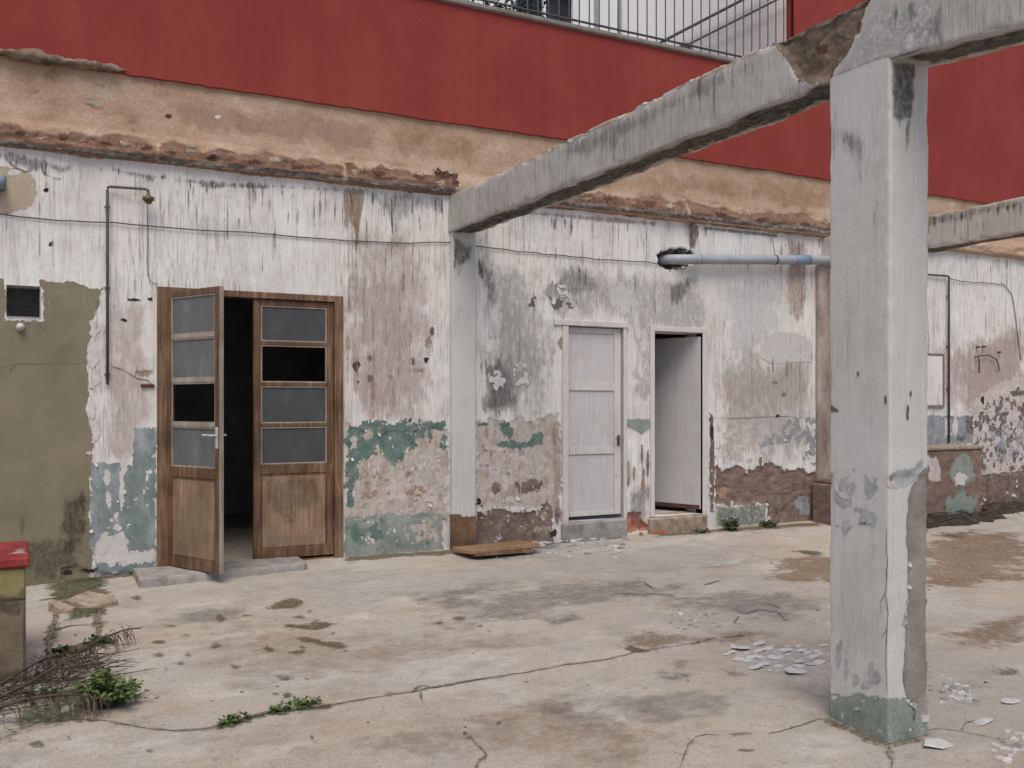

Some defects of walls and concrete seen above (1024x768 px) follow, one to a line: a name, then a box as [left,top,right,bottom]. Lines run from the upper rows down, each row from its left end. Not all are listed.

flaking render [515,0,869,166]
leakage [6,153,69,189]
leakage [188,180,266,222]
flaking render [0,123,459,195]
leakage [528,269,587,310]
leakage [672,280,690,303]
leakage [481,343,529,412]
peeling [62,319,157,577]
flaking render [343,412,650,559]
flaking render [708,413,816,524]
peeling [927,373,1024,505]
peeling [722,459,954,749]